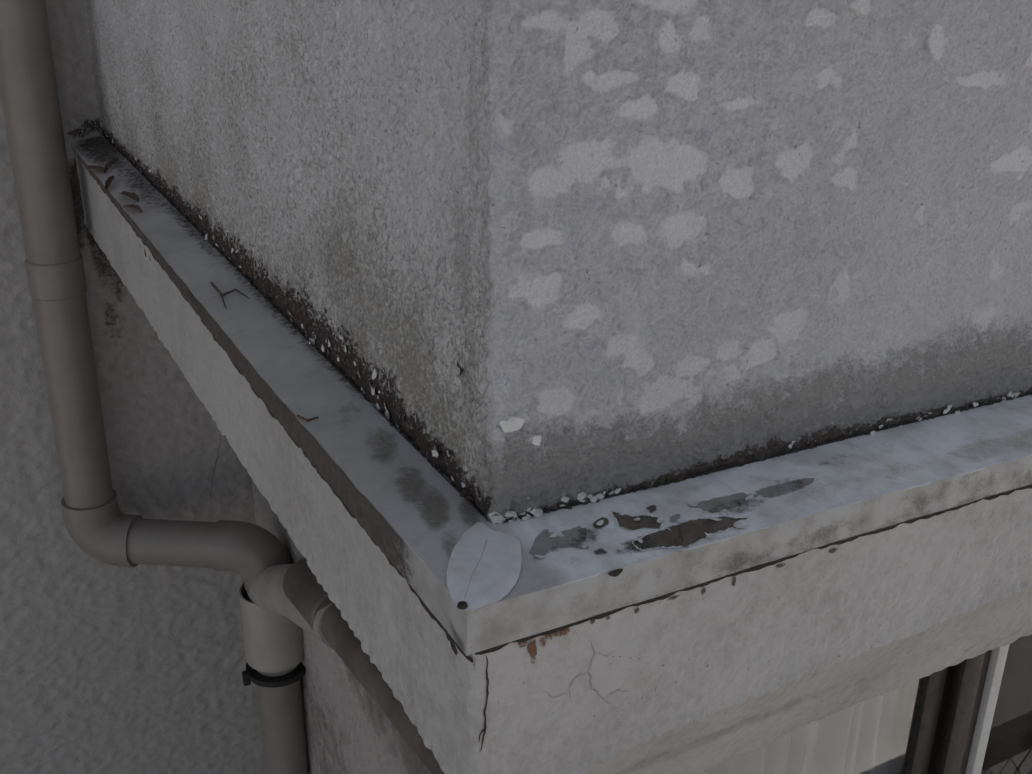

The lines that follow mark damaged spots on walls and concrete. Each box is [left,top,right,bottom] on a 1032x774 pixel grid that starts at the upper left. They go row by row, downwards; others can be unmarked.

water stain [68,118,1032,582]
peeling [499,416,525,433]
peeling [488,508,543,524]
peeling [529,478,815,558]
rust [518,628,570,663]
crack [479,656,489,751]